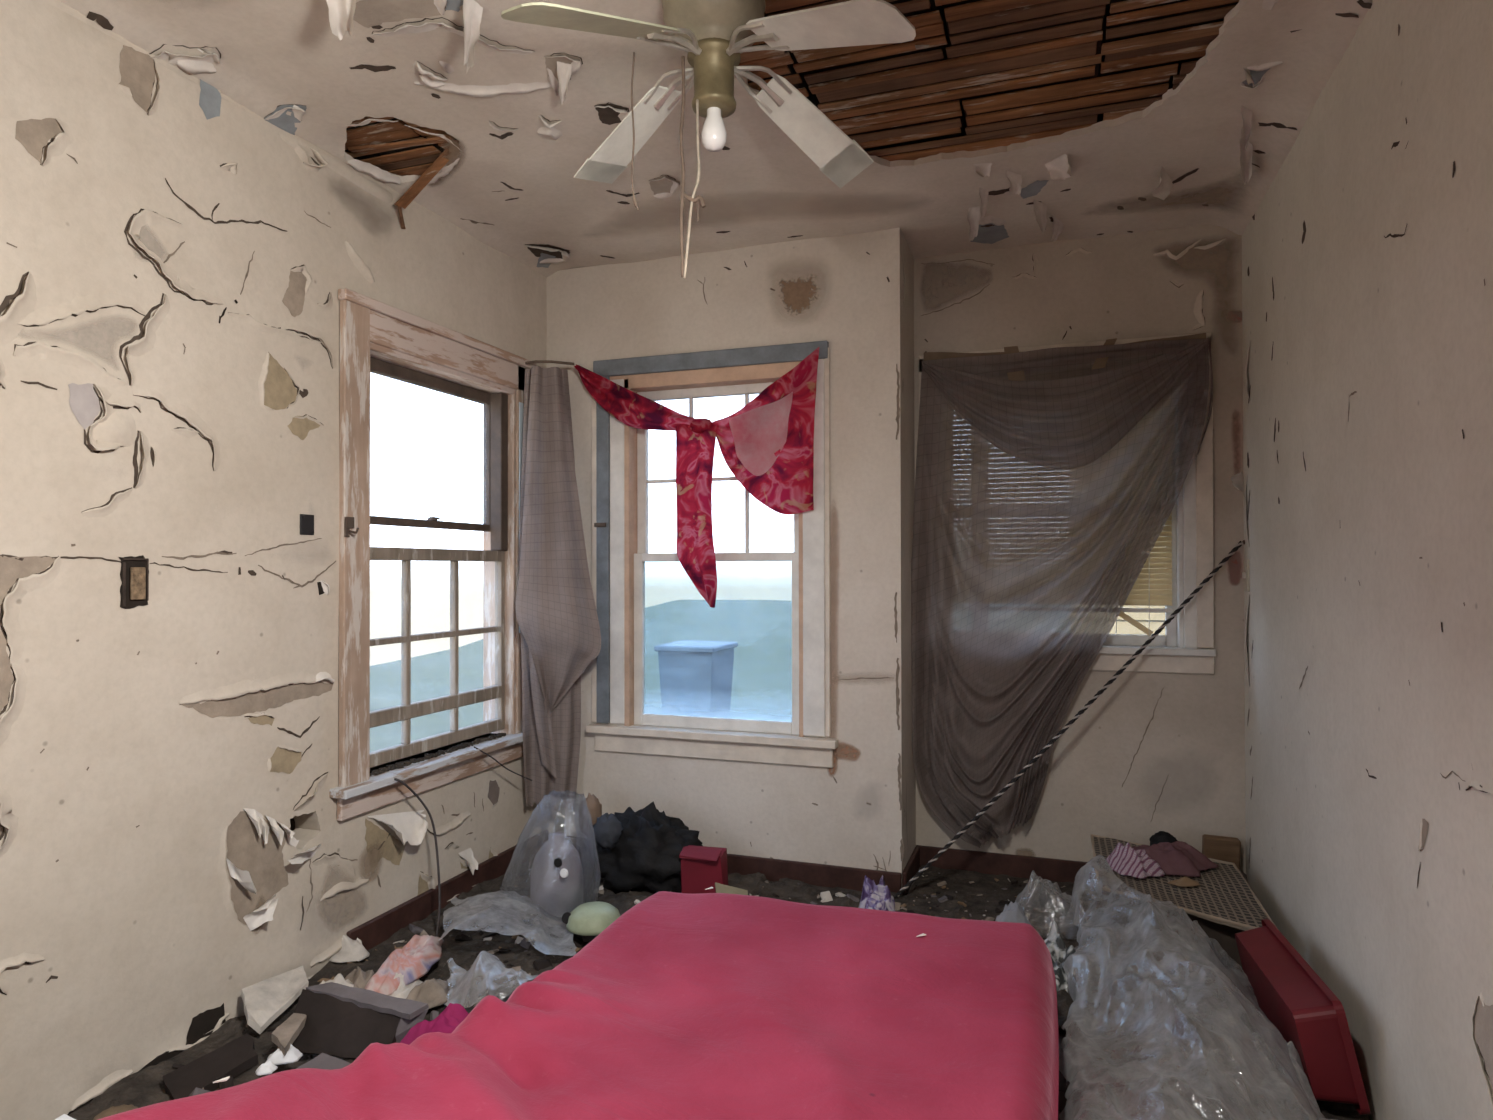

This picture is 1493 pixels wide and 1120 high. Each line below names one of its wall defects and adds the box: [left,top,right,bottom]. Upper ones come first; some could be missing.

peeling [326,0,583,140]
peeling [15,118,74,167]
crack [163,178,331,295]
leakage [779,277,817,314]
crack [21,381,57,390]
peeling [0,209,337,518]
crack [0,538,336,589]
peeling [0,544,76,748]
peeling [179,672,335,726]
peeling [217,772,369,932]
peeling [365,810,498,902]
flaking render [67,1003,230,1115]